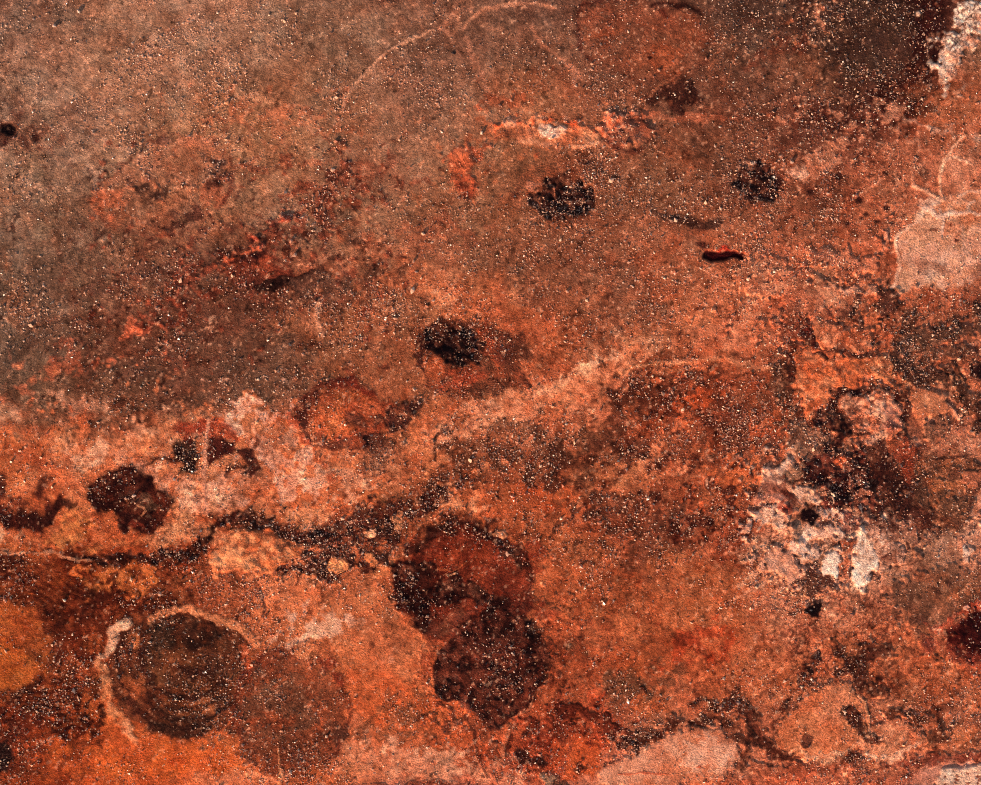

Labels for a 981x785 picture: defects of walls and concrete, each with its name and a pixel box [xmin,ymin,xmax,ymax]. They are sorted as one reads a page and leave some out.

corrosion [566,0,728,87]
corrosion [437,62,600,209]
efflorescence [884,142,981,309]
corrosion [0,403,280,546]
corrosion [271,363,401,486]
corrosion [375,502,571,649]
water stain [732,435,981,643]
corrosion [917,596,981,680]